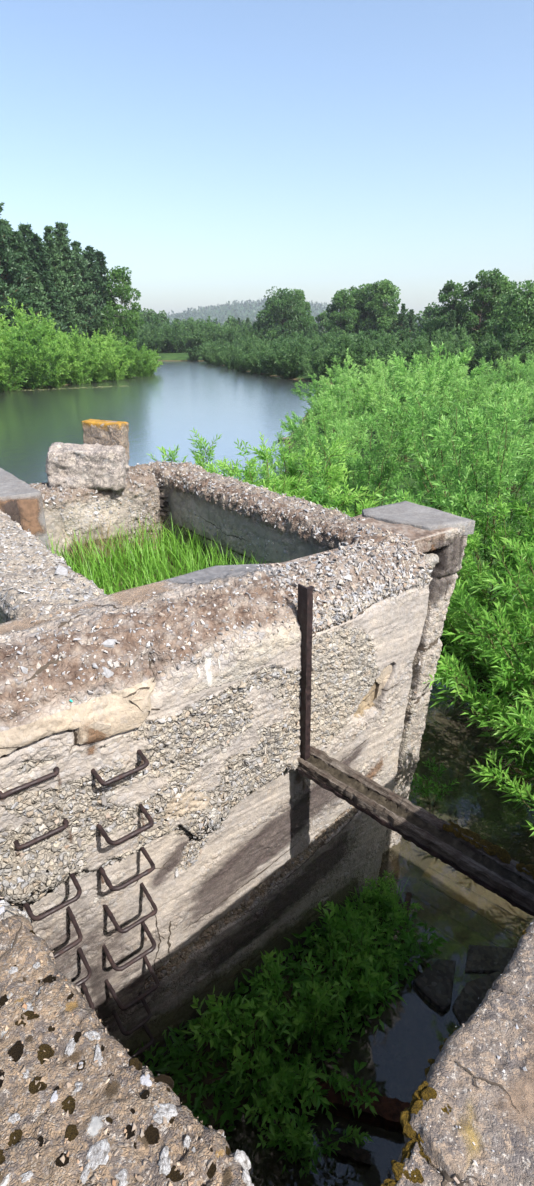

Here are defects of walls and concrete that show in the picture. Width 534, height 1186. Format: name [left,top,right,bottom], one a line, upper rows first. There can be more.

spalling [0,569,433,922]
damp [153,842,188,886]
damp [189,784,338,919]
damp [204,832,348,967]